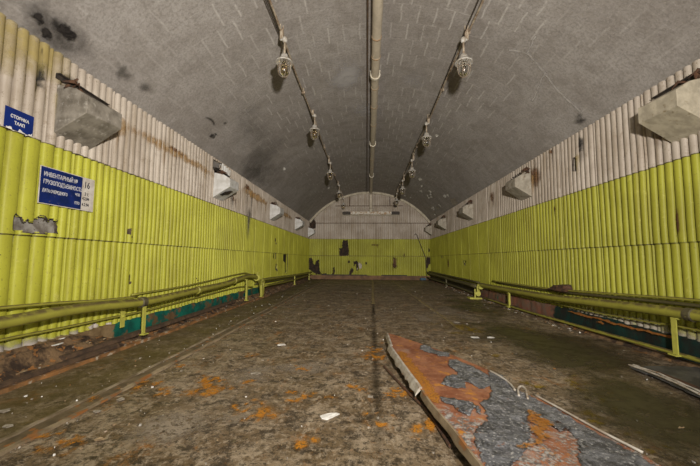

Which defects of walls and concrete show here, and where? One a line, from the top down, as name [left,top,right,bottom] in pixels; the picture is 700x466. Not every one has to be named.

leakage [0,12,59,77]
rust [143,135,207,172]
rust [246,185,266,205]
spalling [13,214,58,241]
spalling [309,257,335,274]
spalling [339,240,367,275]
peeling [569,308,700,342]